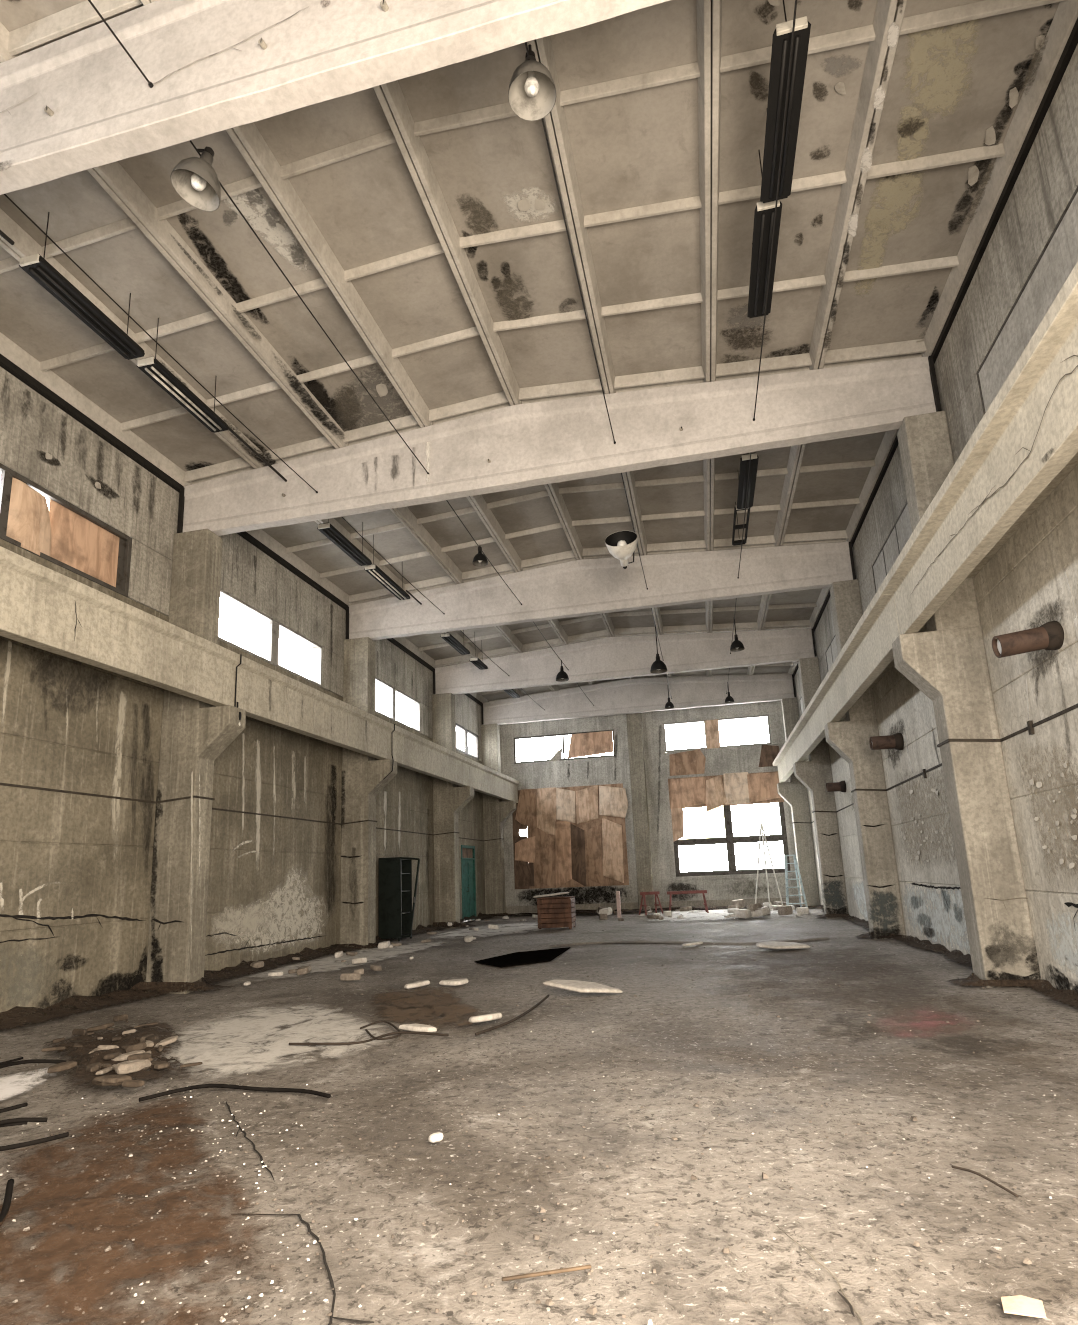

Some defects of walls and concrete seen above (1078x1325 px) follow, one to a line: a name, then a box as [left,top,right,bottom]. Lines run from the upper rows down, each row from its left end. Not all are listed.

spalling [949,4,1053,231]
peeling [461,198,497,249]
peeling [504,187,555,222]
damp [61,417,84,455]
damp [119,467,154,512]
damp [2,641,12,721]
damp [31,650,163,1003]
damp [823,881,970,950]
damp [986,913,1078,1000]